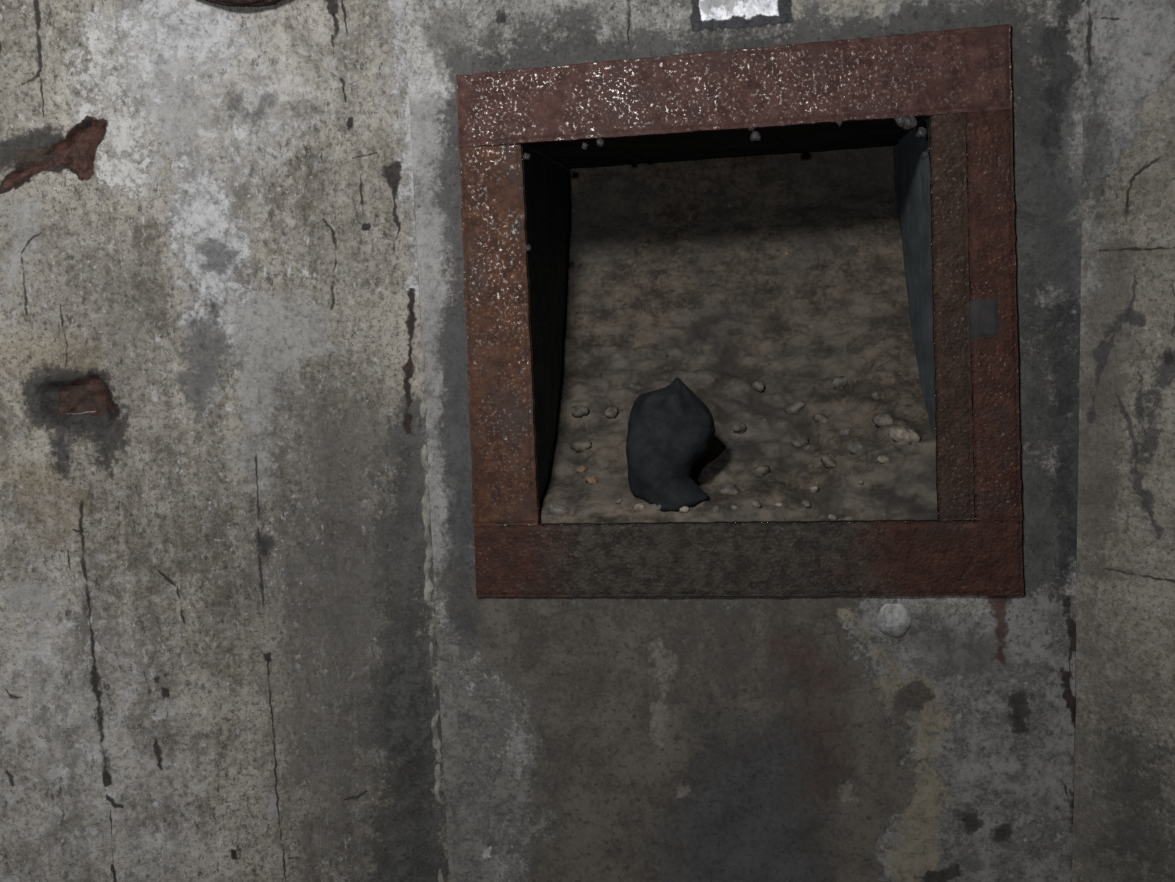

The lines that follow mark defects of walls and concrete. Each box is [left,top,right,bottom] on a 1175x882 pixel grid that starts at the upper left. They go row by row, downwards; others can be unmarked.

rust [748,126,762,141]
crack [1099,244,1168,252]
damp [362,0,1146,882]
damp [1116,350,1175,539]